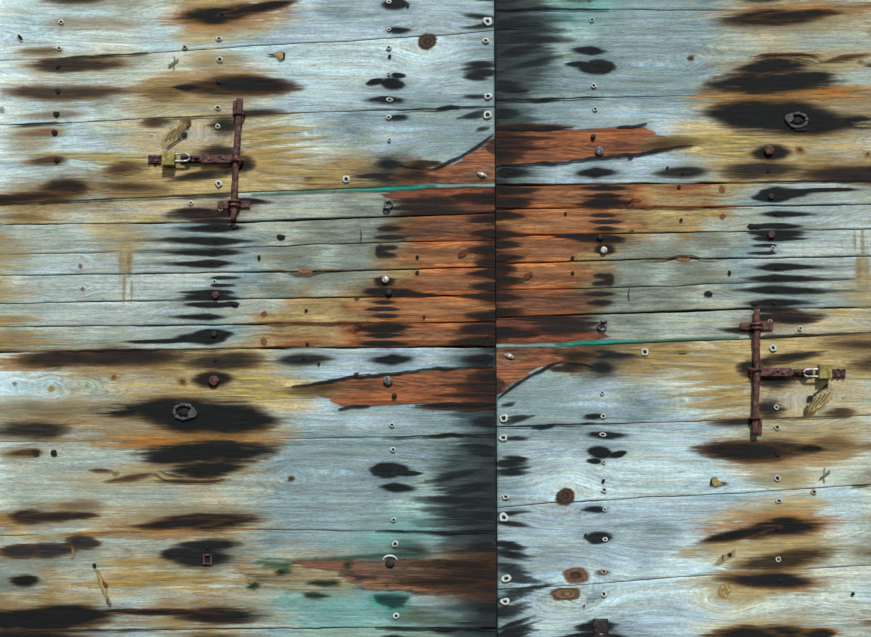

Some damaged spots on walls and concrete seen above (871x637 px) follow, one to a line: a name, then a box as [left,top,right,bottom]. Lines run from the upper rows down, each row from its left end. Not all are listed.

crack [396,96,604,111]
crack [617,121,647,129]
crack [398,126,573,170]
crack [496,145,693,165]
damp [640,52,871,323]
damp [0,208,349,484]
crack [291,366,495,387]
crack [415,361,593,407]
crack [338,403,370,411]
crack [381,422,595,438]